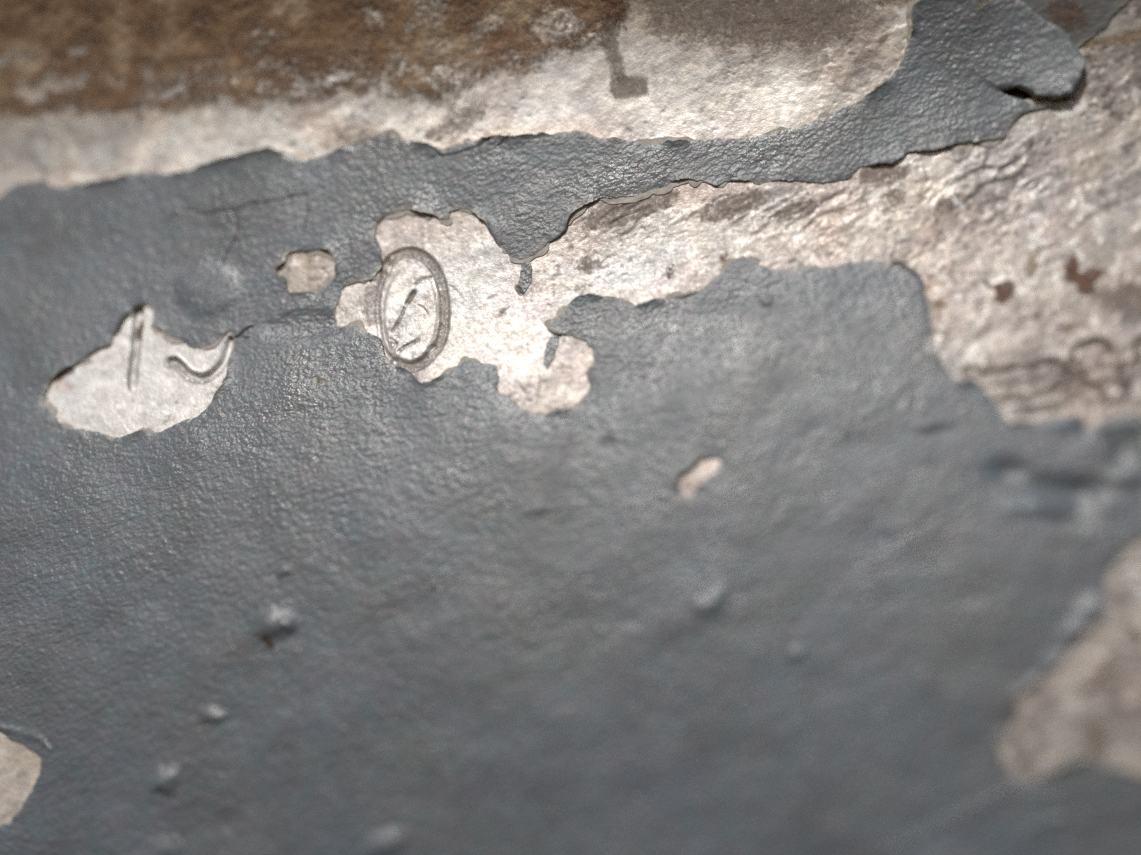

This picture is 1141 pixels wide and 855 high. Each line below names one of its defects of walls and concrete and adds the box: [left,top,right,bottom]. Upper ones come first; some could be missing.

peeling [0,0,909,196]
crack [165,179,313,271]
peeling [278,252,335,292]
peeling [335,0,1141,428]
peeling [47,306,234,437]
peeling [678,458,721,497]
peeling [997,540,1141,780]
peeling [0,733,41,824]